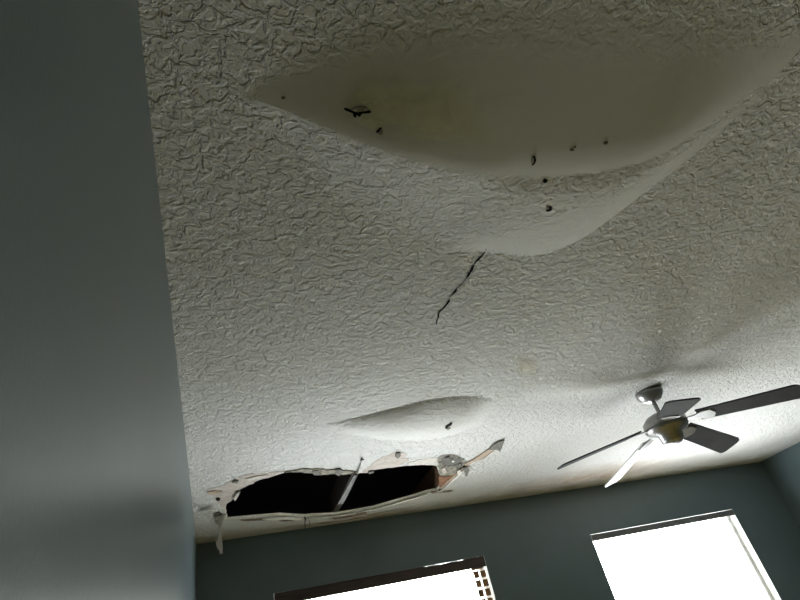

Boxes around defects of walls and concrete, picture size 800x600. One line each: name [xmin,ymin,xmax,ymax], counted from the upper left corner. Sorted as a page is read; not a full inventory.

crack [436,249,486,325]
peeling [207,471,285,507]